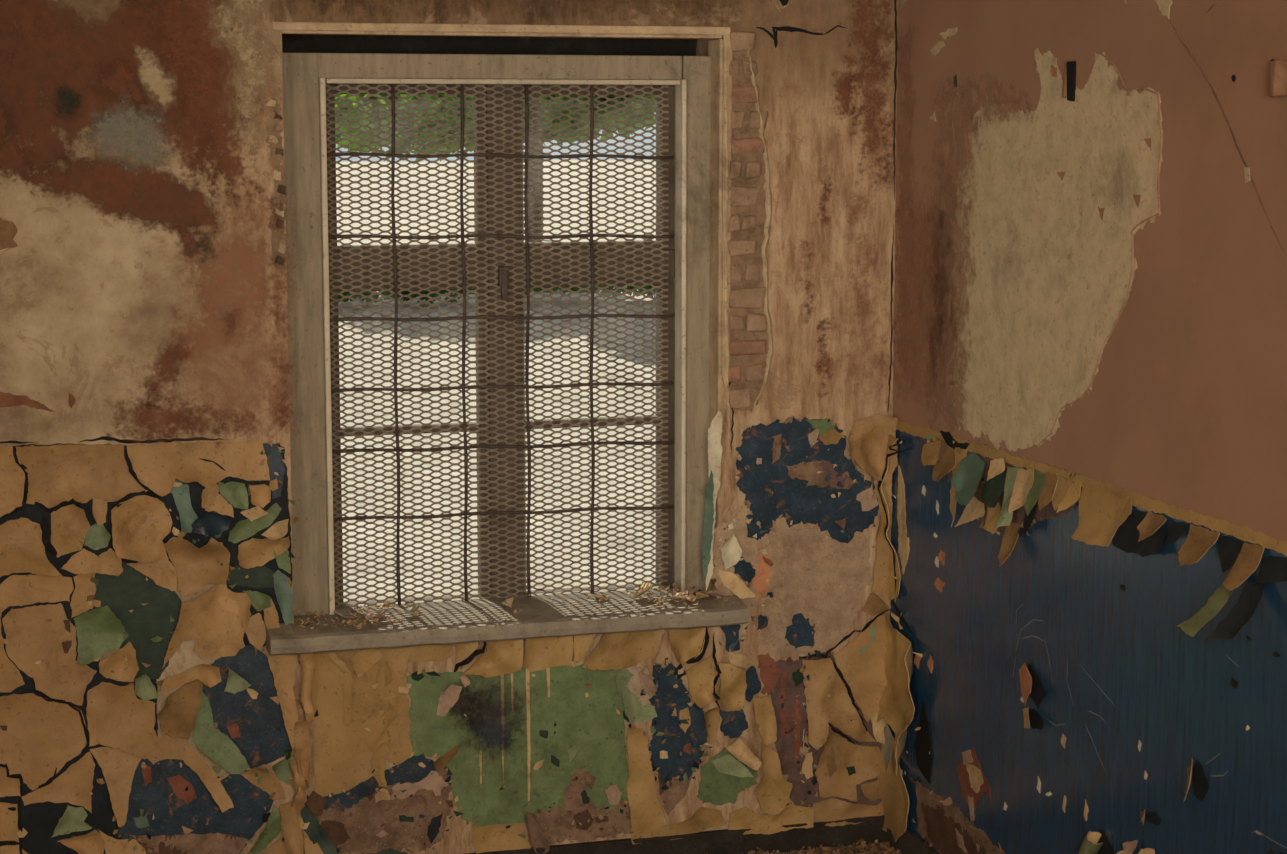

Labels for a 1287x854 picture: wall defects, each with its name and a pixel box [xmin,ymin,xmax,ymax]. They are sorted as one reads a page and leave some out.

flaking render [52,0,121,22]
flaking render [136,48,175,106]
spalling [215,0,287,273]
crack [756,25,846,48]
crack [1155,0,1284,252]
spalling [0,216,20,254]
crack [0,436,225,559]
peeling [312,27,1287,854]
peeling [0,440,462,854]
crack [799,609,889,744]
crack [0,679,90,854]